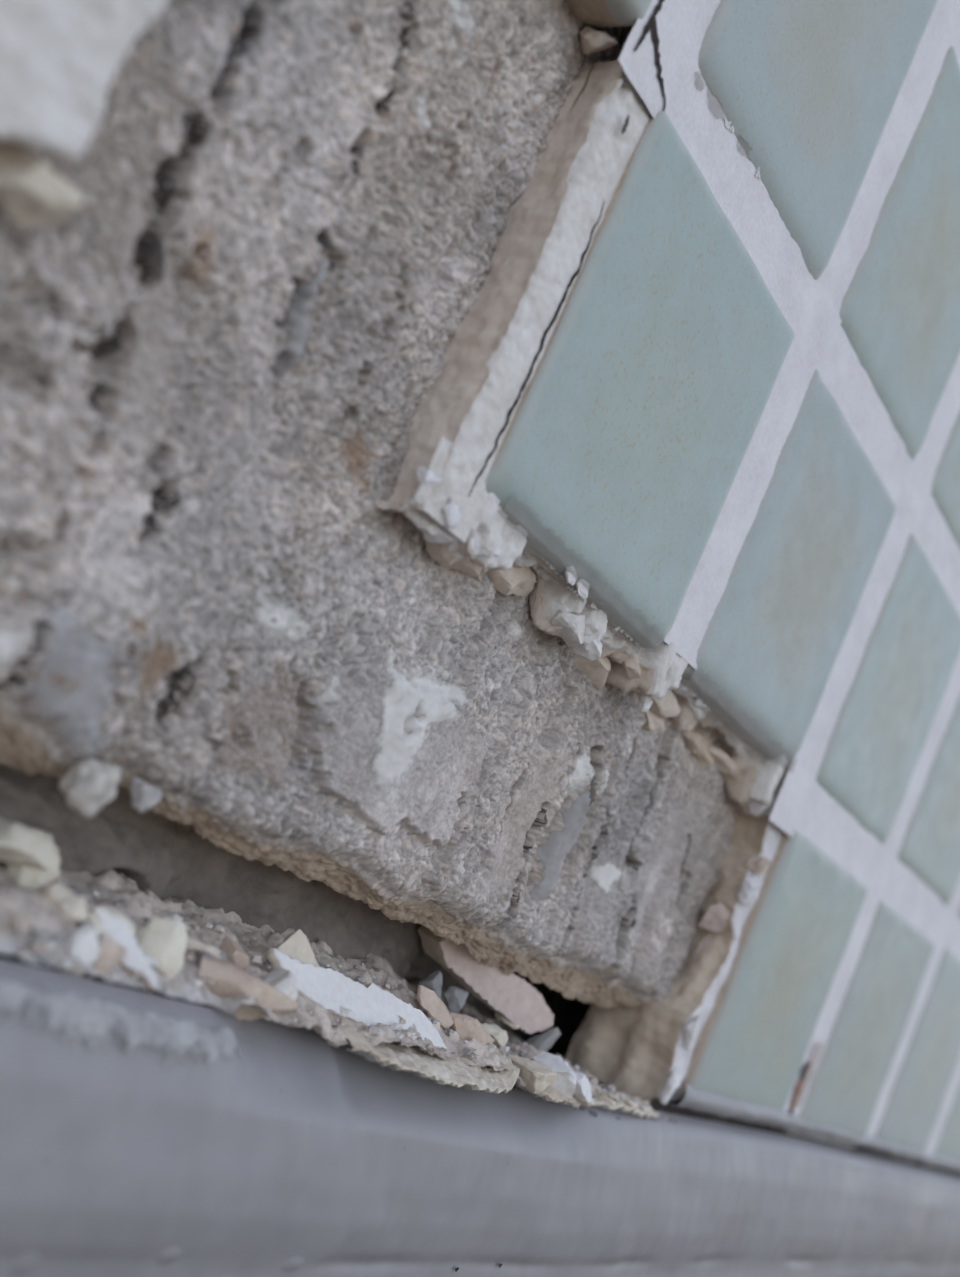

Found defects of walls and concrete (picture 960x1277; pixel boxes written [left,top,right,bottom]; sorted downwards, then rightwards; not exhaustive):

crack [634,0,666,111]
spalling [0,0,792,1122]
rust [790,1061,812,1115]